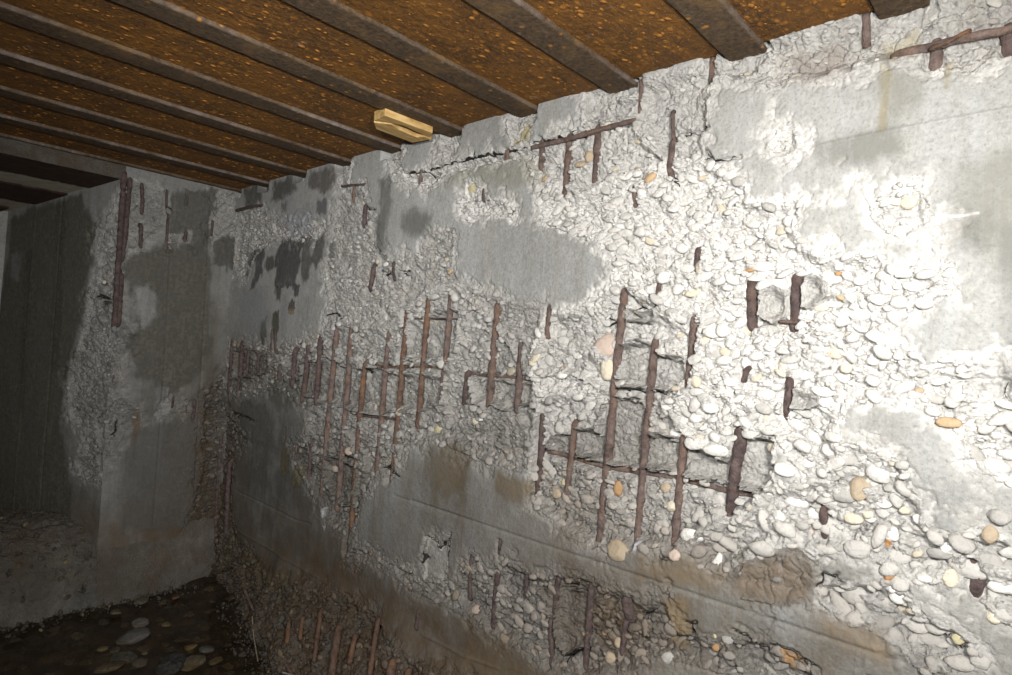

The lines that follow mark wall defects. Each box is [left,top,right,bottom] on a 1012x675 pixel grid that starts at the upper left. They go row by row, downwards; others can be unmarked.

spalling [66,171,191,483]
water stain [244,167,337,345]
spalling [184,161,676,675]
crack [403,130,587,181]
spalling [343,0,1012,675]